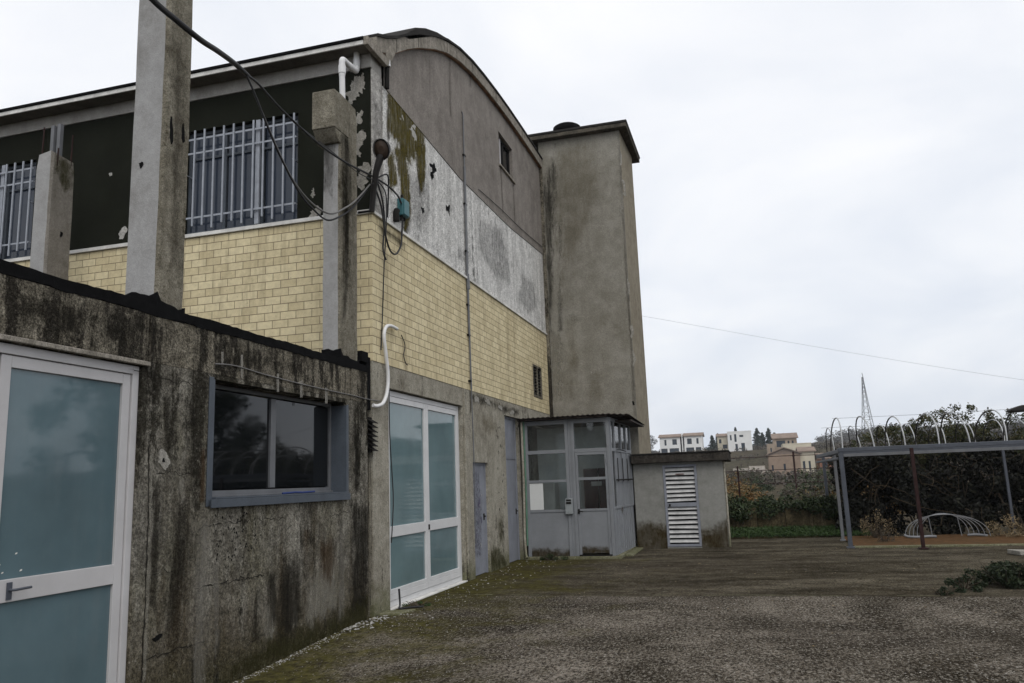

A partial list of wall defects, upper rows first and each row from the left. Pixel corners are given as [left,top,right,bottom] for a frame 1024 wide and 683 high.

peeling [345,73,372,191]
leakage [381,126,426,245]
leakage [544,166,575,395]
leakage [8,283,169,450]
spalling [158,449,170,471]
leakage [255,428,368,636]